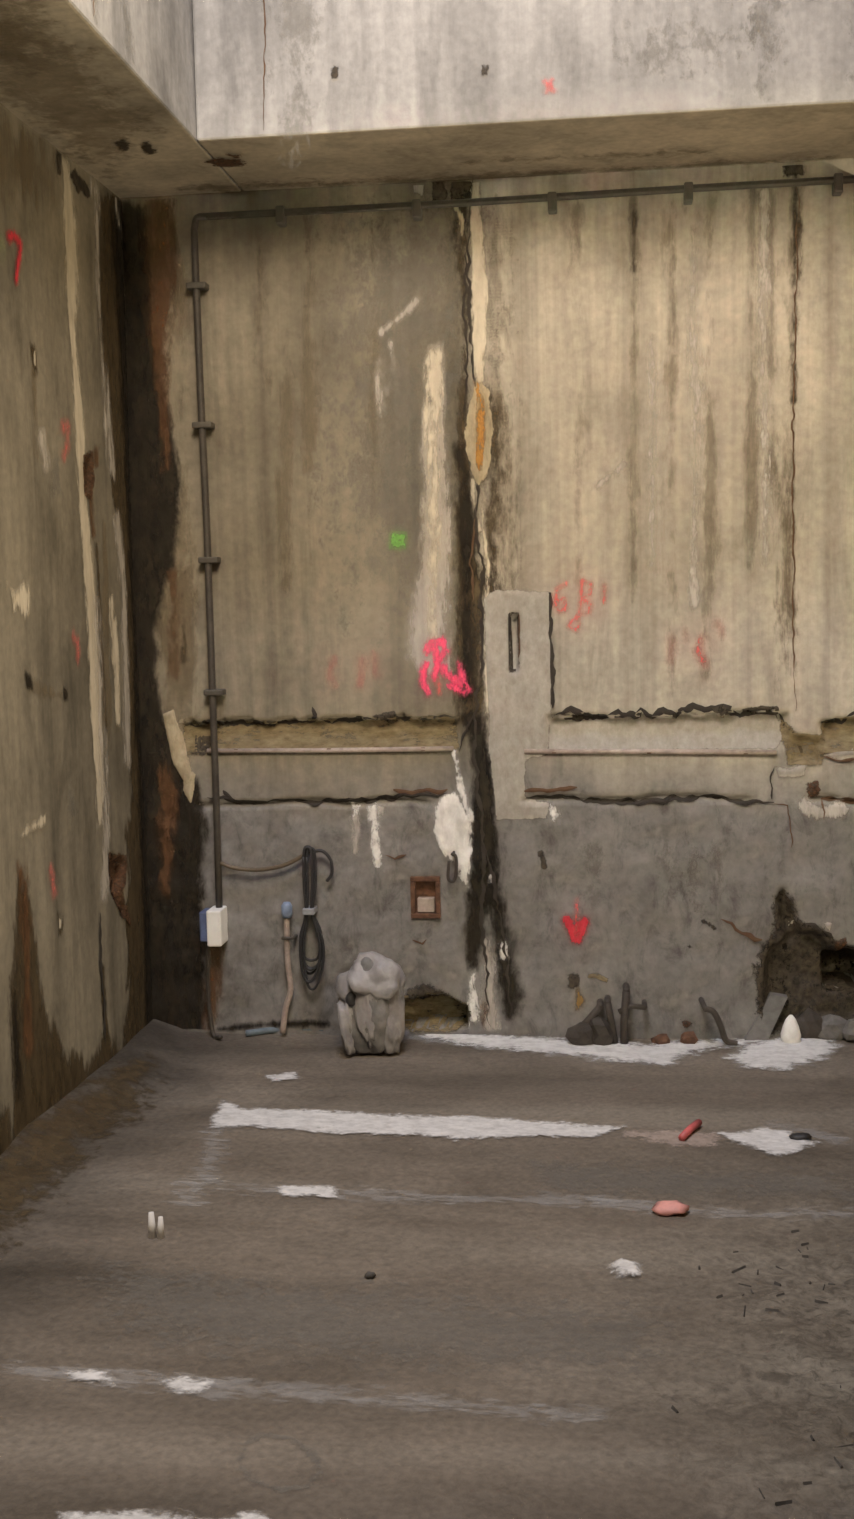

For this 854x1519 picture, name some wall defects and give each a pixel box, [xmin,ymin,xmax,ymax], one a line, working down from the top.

crack [461,180,476,422]
water stain [759,188,771,342]
water stain [793,189,802,284]
water stain [410,182,525,1029]
water stain [689,519,698,607]
corrosion [157,767,179,894]
spalling [163,707,459,803]
crack [207,484,556,1027]
crack [524,766,854,847]
corrosion [11,867,66,1137]
spalling [701,889,854,1035]